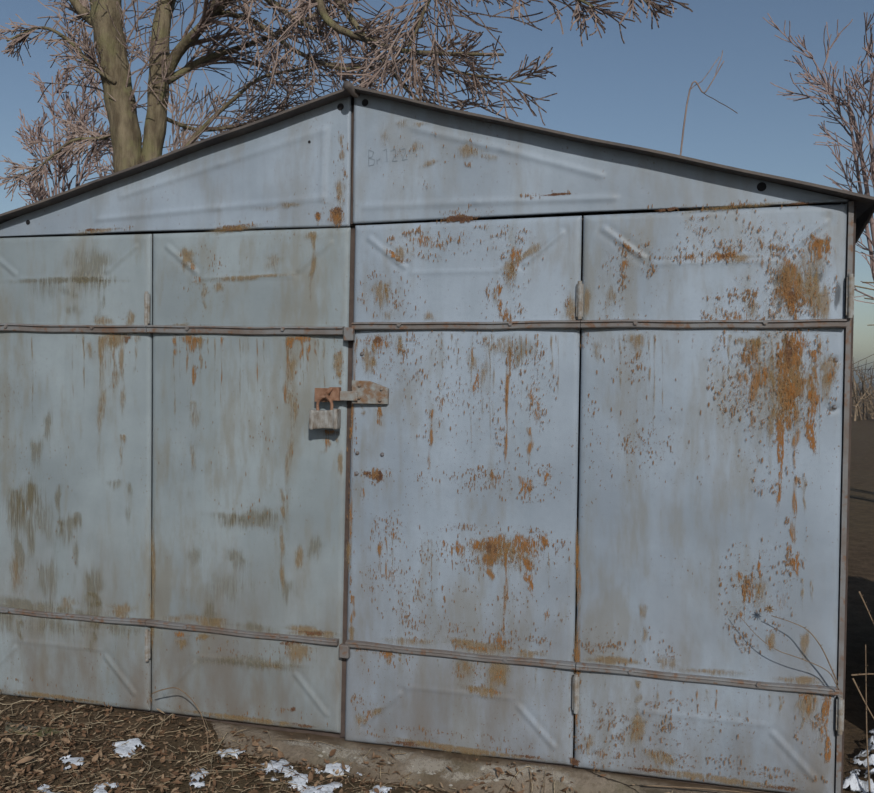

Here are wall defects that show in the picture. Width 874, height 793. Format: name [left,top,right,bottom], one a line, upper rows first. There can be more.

corrosion [315,131,349,228]
corrosion [257,336,316,419]
corrosion [355,204,562,503]
corrosion [554,199,839,654]
corrosion [347,467,581,697]
corrosion [569,624,651,689]
corrosion [351,695,540,759]
corrosion [569,677,832,791]